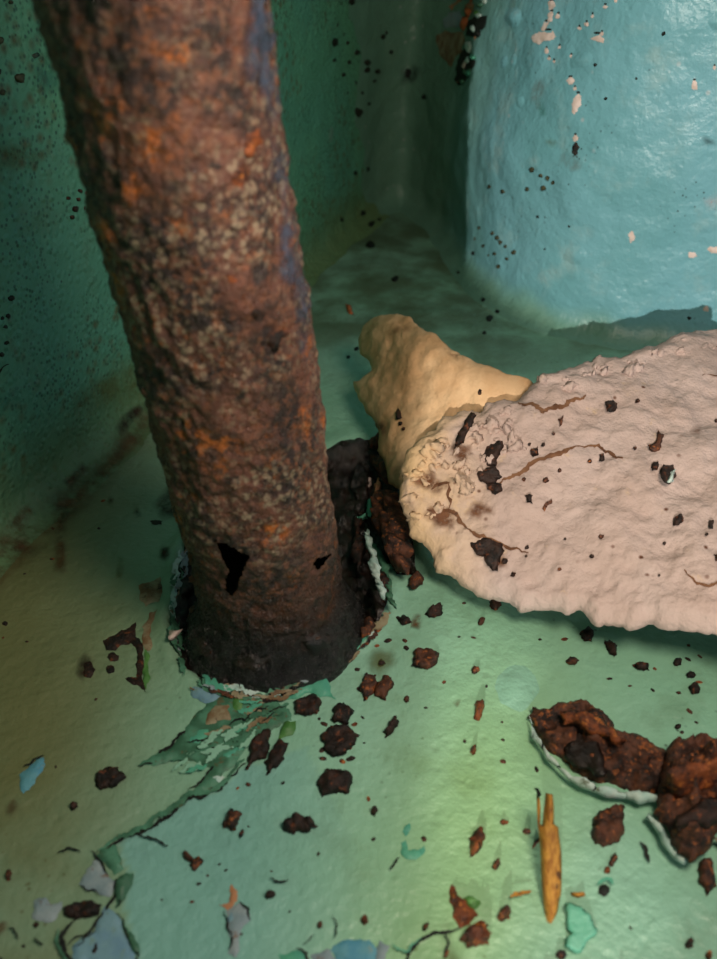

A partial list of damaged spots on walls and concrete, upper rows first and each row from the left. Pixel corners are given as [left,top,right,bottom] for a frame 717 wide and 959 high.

spalling [531,0,572,63]
spalling [566,75,581,114]
corrosion [231,129,263,188]
corrosion [267,330,290,352]
crack [518,395,586,414]
crack [500,444,623,483]
crack [427,481,529,553]
spalling [326,438,417,662]
peeling [72,546,336,959]
corrosion [591,804,625,874]
peeling [278,916,390,959]
crack [392,927,461,959]